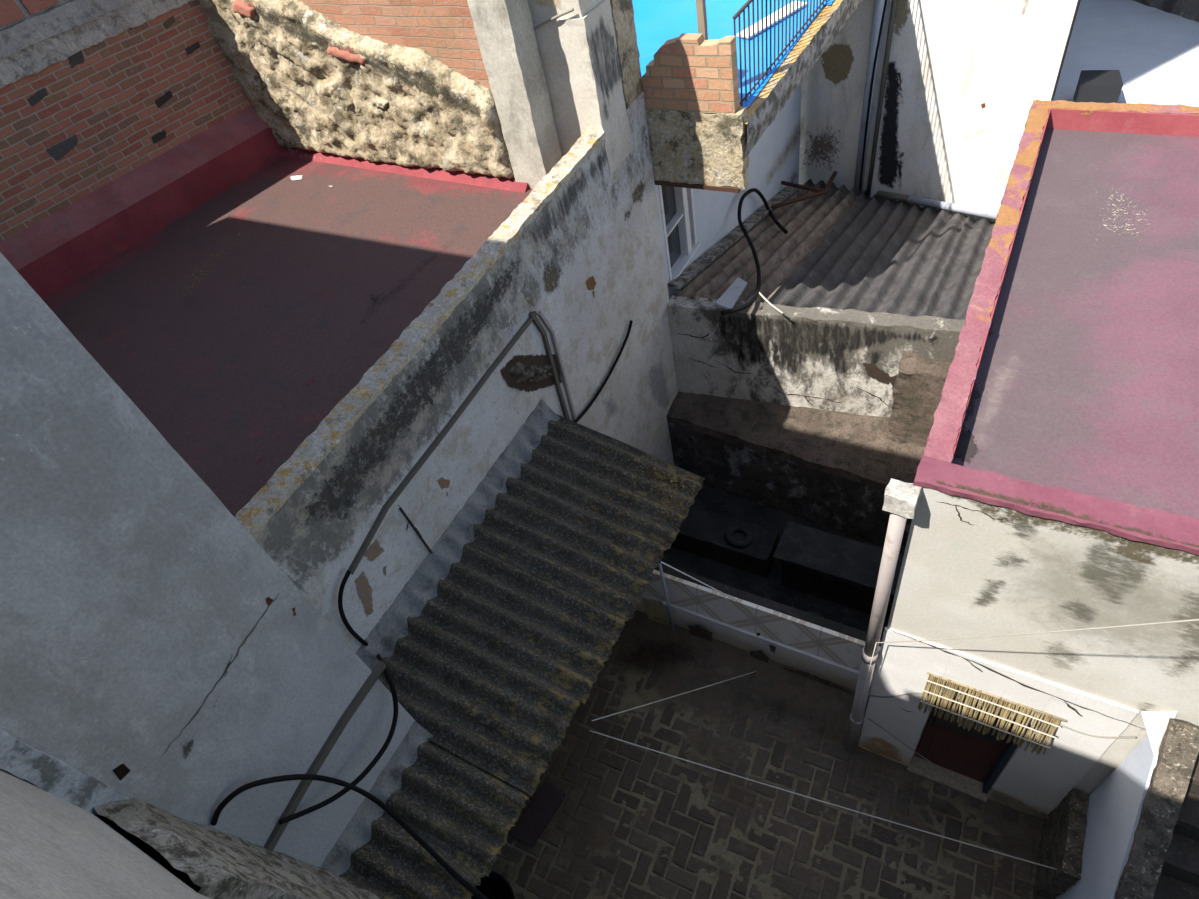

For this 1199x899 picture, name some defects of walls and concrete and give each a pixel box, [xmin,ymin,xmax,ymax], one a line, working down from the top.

mould [587,16,622,116]
water stain [766,124,842,217]
water stain [877,61,904,190]
mould [305,261,519,524]
spalling [500,354,563,392]
water stain [714,316,937,375]
peeling [355,540,386,616]
crack [889,629,1146,730]
water stain [1050,644,1078,664]
water stain [936,481,1199,605]
water stain [1063,603,1092,621]
water stain [1178,594,1199,667]